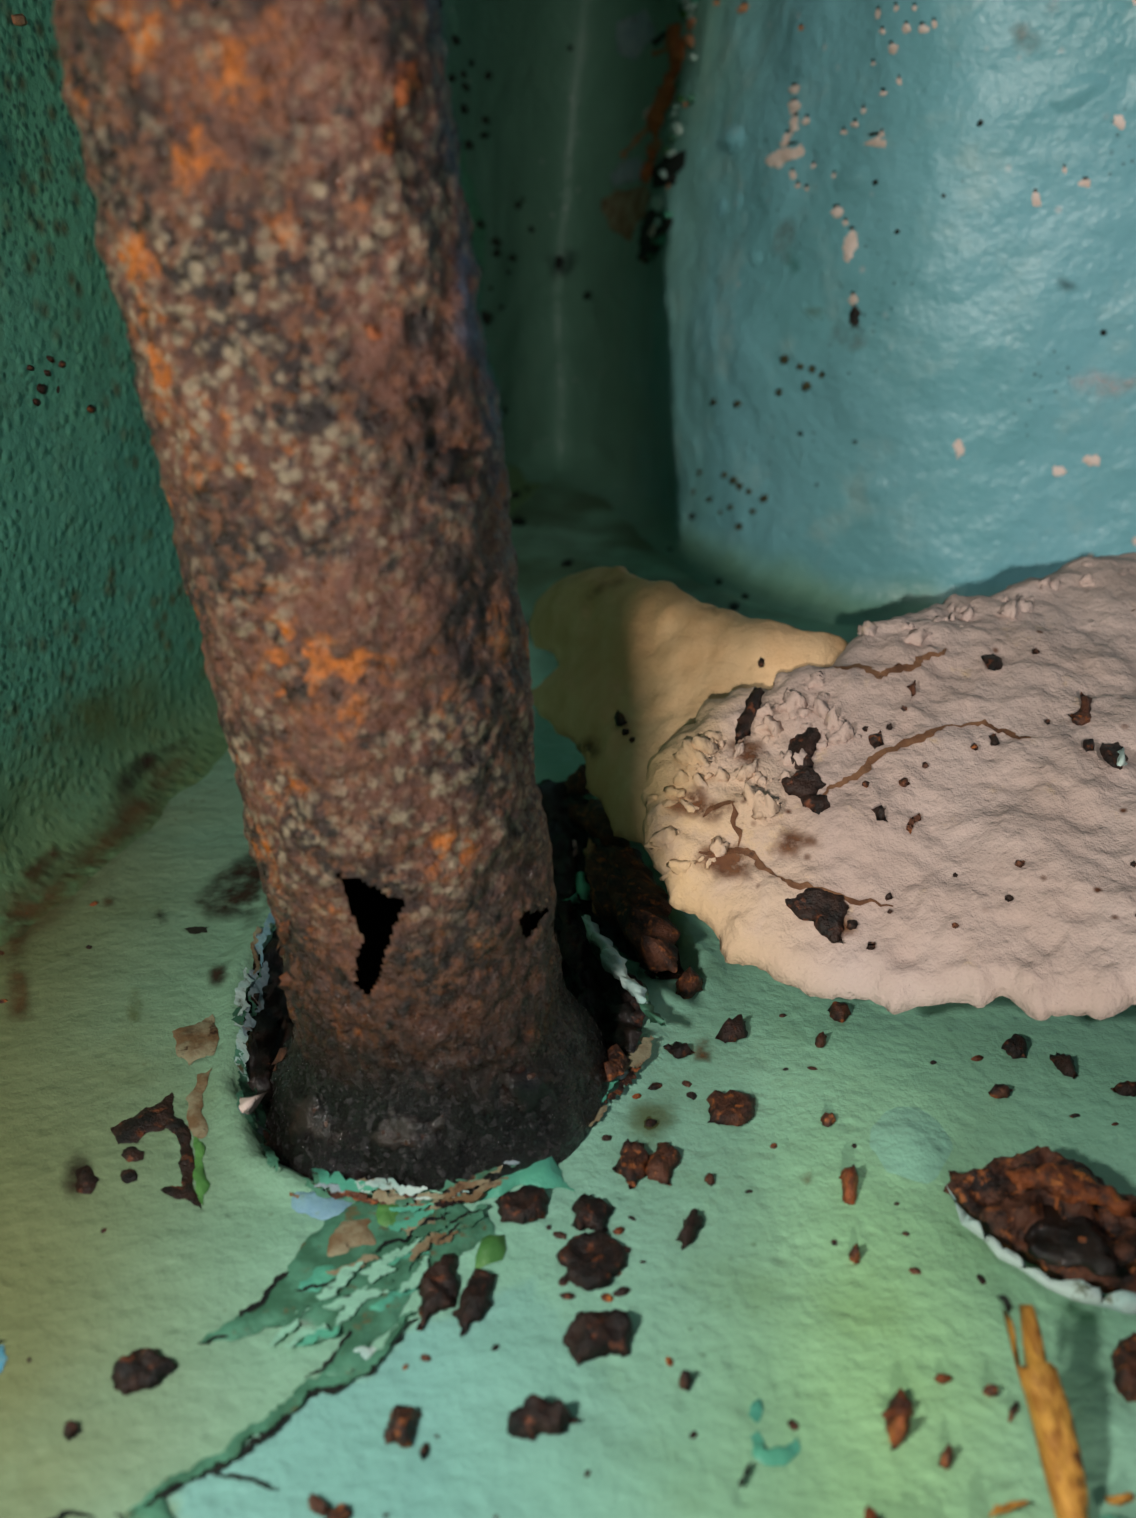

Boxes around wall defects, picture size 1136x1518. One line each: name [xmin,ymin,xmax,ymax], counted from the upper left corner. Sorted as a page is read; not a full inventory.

corrosion [371,60,423,157]
spalling [765,82,816,191]
spalling [830,204,859,263]
crack [834,648,947,679]
crack [822,719,1031,795]
crack [699,800,893,907]
corrosion [184,856,262,934]
spalling [536,779,684,1127]
spalling [68,1159,99,1194]
peeling [110,910,575,1518]
corrosion [982,1384,1019,1423]
corrosion [1110,1332,1136,1403]